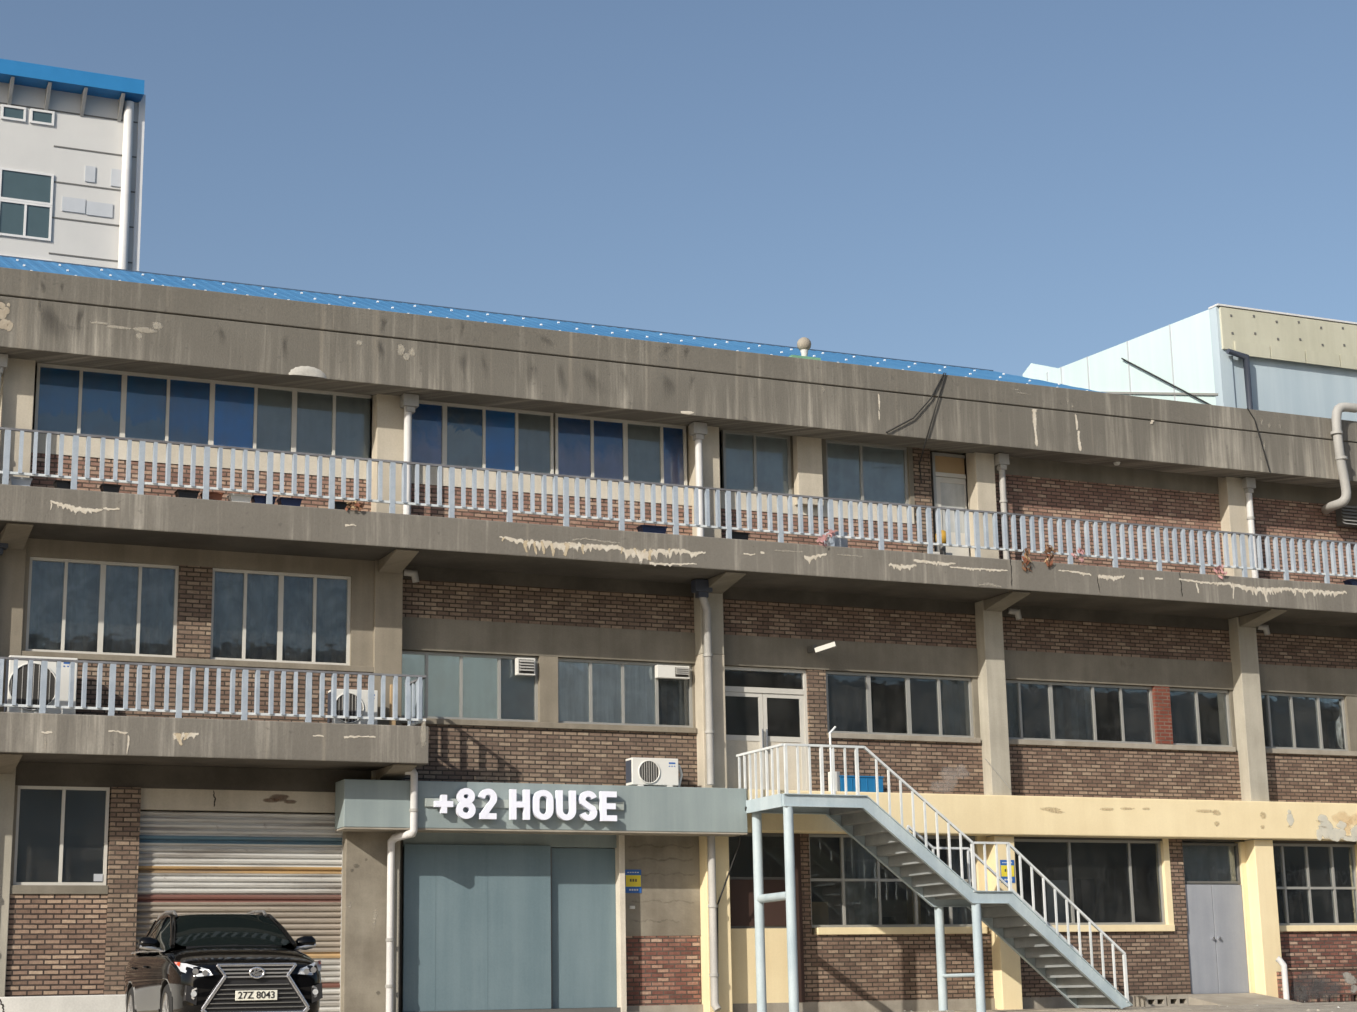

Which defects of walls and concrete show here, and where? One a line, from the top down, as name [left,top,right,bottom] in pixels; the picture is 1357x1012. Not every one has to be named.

spalling [0,302,13,331]
peeling [1316,814,1357,842]